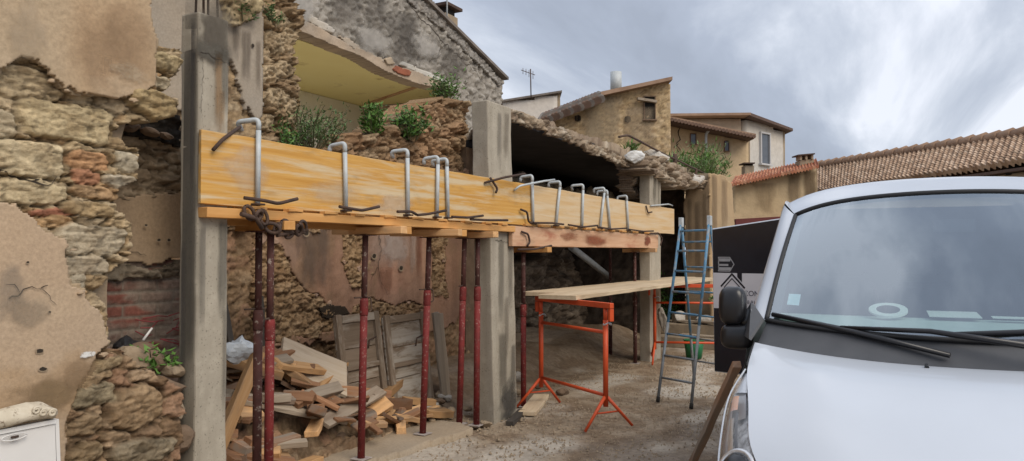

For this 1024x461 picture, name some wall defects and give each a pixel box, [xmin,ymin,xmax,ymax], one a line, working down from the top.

spalling [0,46,183,357]
crack [7,284,55,303]
spalling [249,232,335,344]
spalling [340,234,377,288]